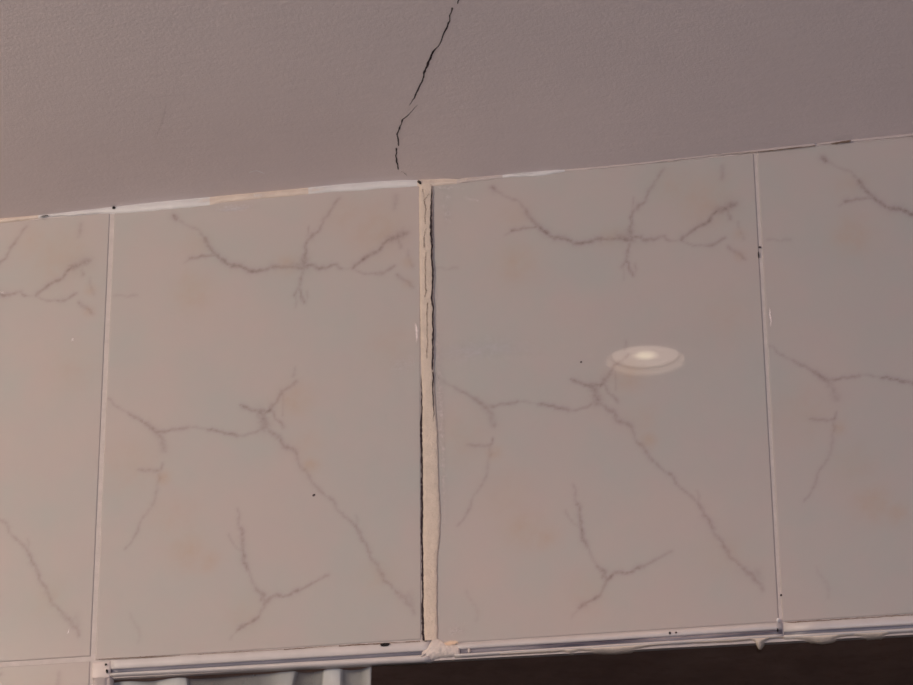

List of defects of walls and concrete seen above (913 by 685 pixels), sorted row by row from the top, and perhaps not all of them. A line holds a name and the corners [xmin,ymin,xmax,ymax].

crack [395,0,459,174]